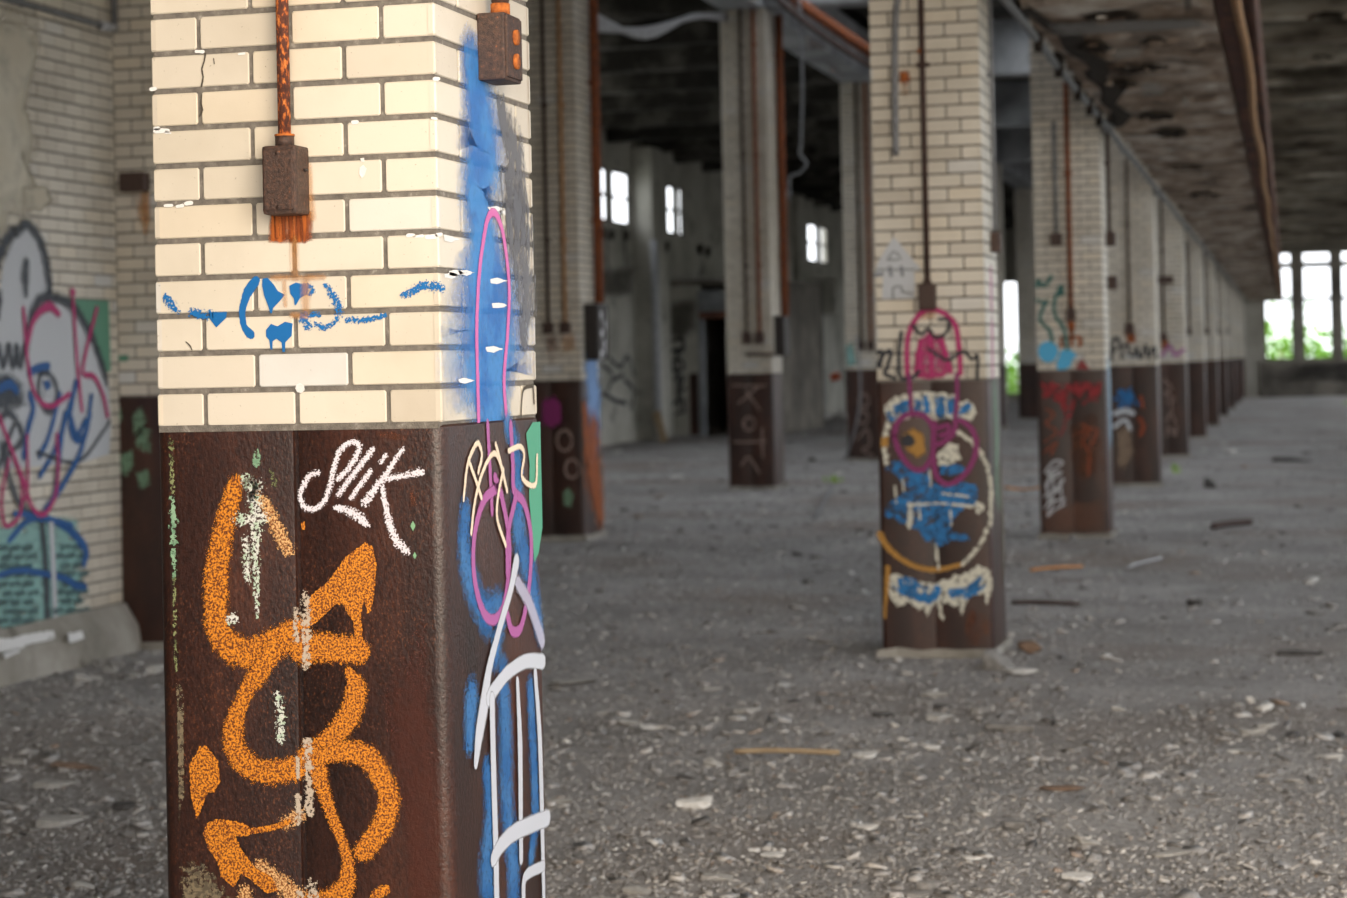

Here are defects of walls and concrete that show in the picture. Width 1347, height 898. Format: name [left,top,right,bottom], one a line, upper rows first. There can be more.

damp [1285,68,1347,92]
corrosion [270,212,312,243]
corrosion [176,685,184,820]
corrosion [179,860,229,898]